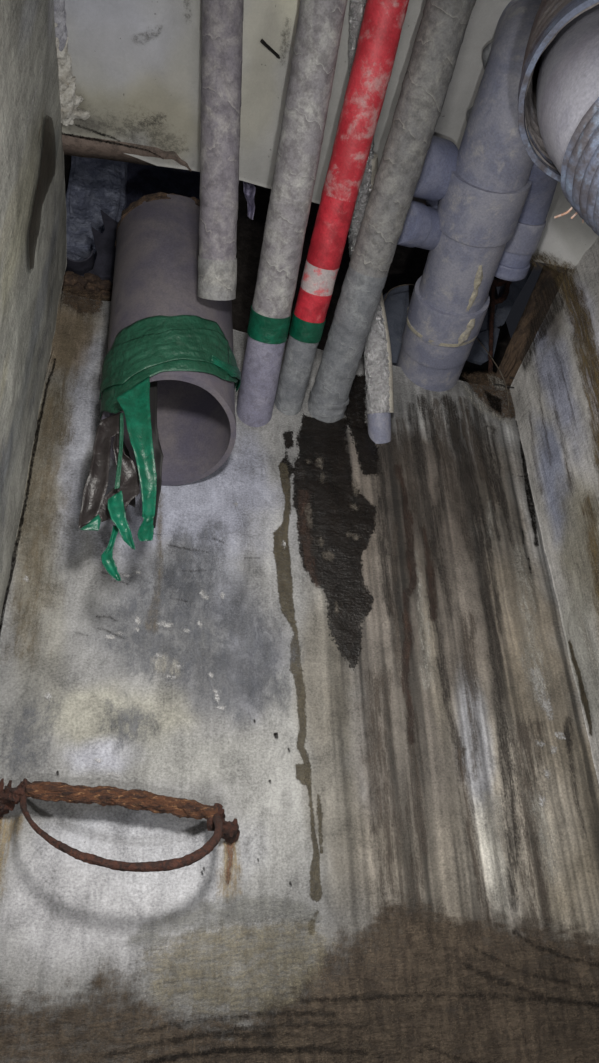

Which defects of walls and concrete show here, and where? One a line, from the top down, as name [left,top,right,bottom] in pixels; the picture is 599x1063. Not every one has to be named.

damp [29,0,90,270]
damp [521,276,563,384]
damp [0,374,599,1063]
corrosion [220,841,240,898]